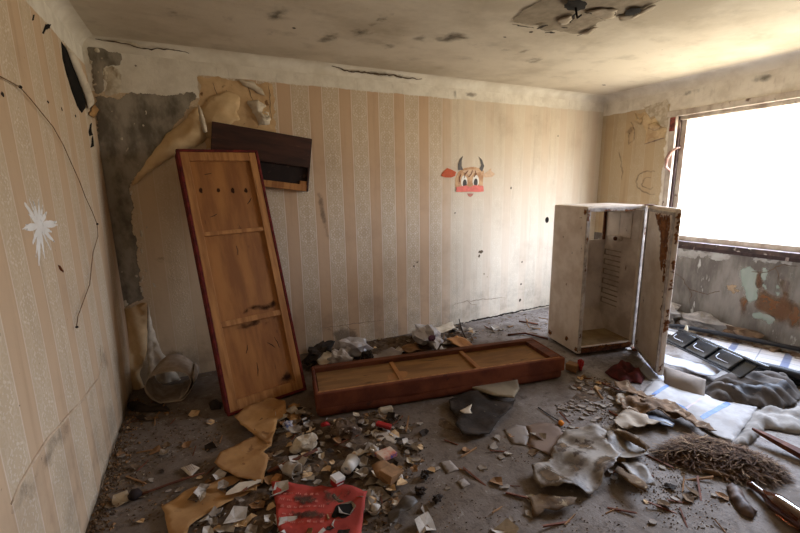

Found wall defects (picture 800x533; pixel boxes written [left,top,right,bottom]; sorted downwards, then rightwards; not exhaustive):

peeling [513,0,659,36]
crack [97,39,189,54]
crack [332,66,420,80]
peeling [131,76,276,186]
peeling [634,99,676,144]
peeling [727,266,780,302]
peeling [752,312,775,324]
rust [740,273,800,327]